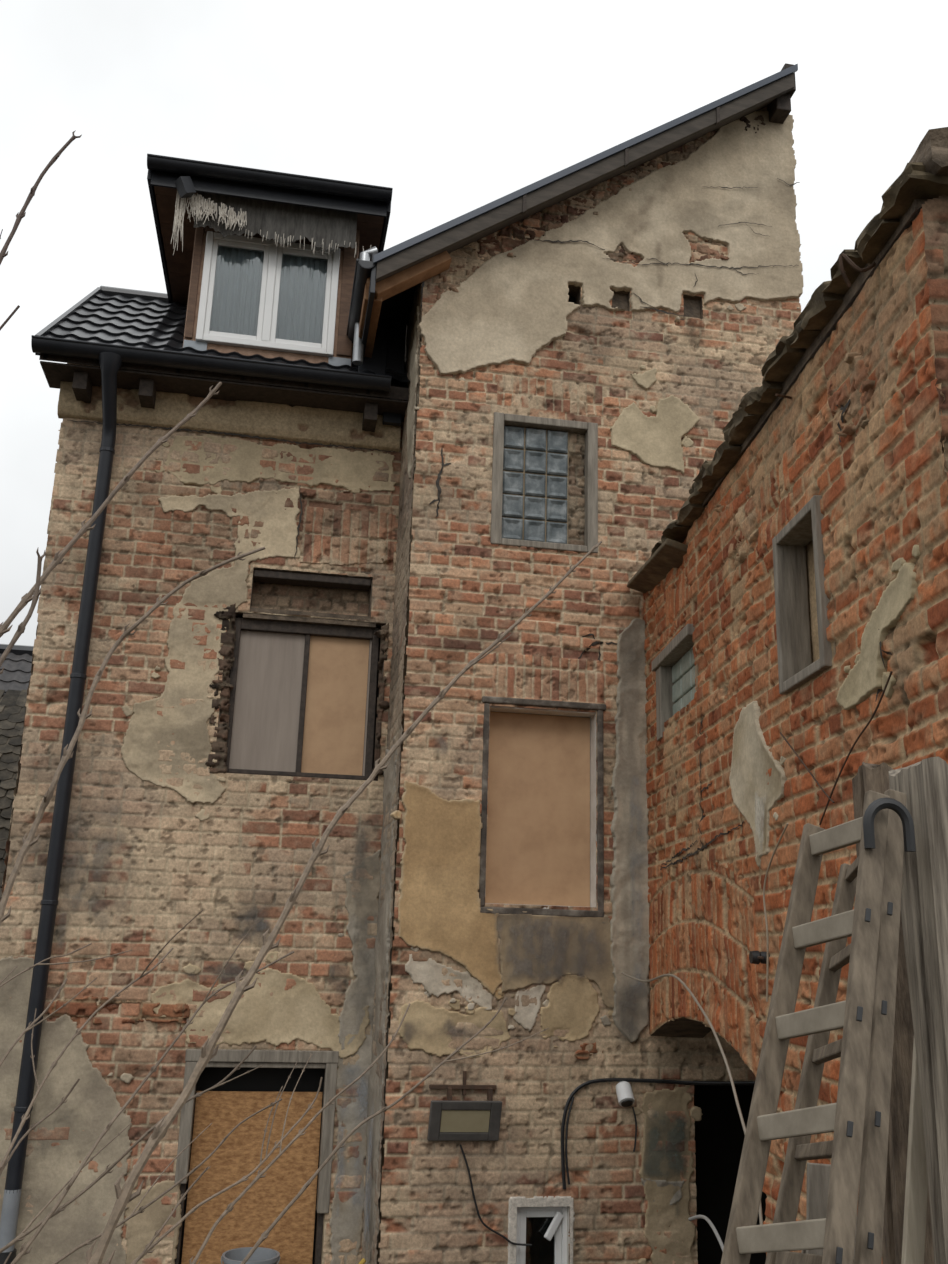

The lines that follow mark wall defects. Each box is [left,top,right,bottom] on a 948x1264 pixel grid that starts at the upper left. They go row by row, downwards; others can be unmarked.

crack [708,178,800,189]
crack [535,222,799,316]
crack [430,448,451,517]
peeling [121,110,804,821]
peeling [836,545,920,710]
peeling [729,701,787,868]
peeling [14,623,615,1264]
peeling [0,955,34,1219]